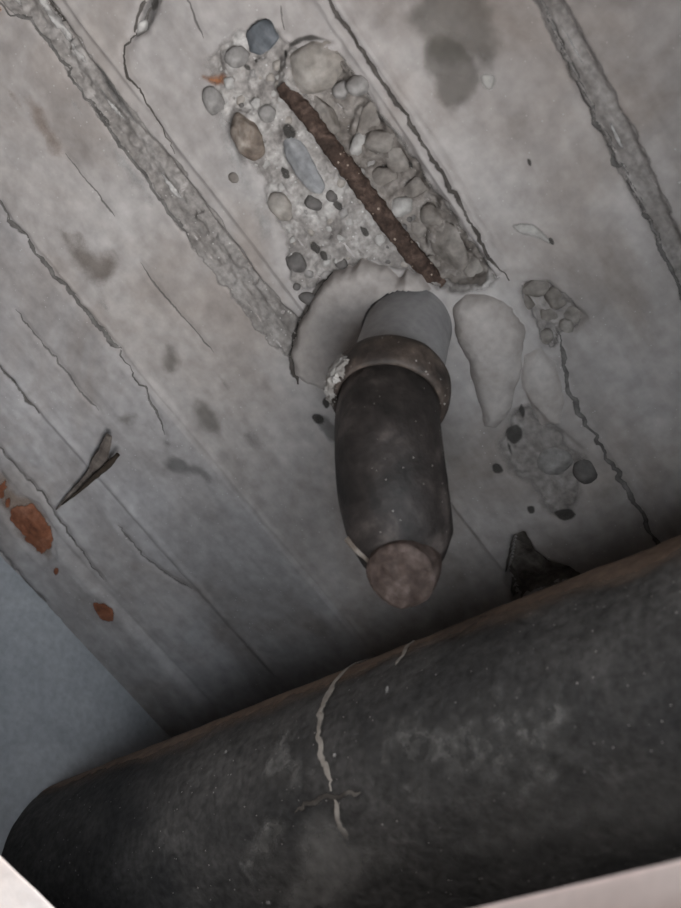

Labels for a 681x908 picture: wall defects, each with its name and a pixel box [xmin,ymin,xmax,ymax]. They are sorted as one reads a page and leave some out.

crack [123,0,175,154]
crack [187,0,204,38]
spalling [202,18,497,305]
crack [558,331,660,545]